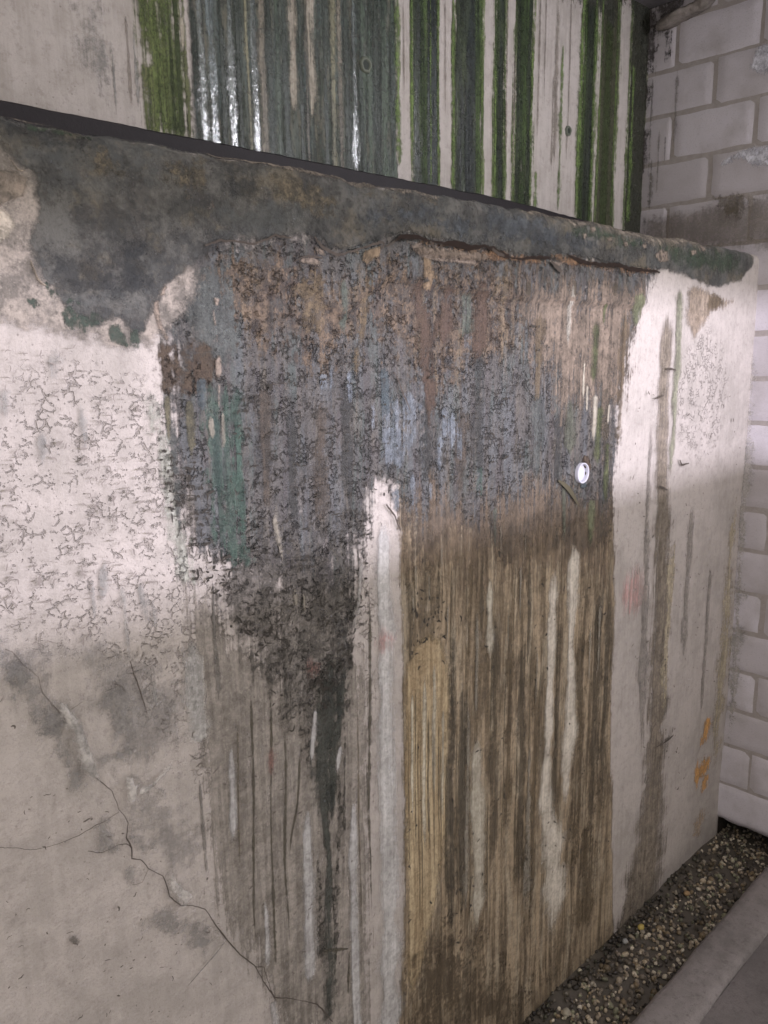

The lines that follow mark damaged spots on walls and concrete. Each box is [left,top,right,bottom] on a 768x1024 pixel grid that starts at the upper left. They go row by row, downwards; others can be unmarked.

water stain [141,0,446,185]
water stain [455,0,484,194]
water stain [493,0,508,199]
water stain [513,0,533,205]
water stain [577,0,603,222]
water stain [595,10,613,225]
water stain [603,0,627,226]
water stain [0,145,136,349]
crack [5,649,80,719]
crack [114,661,147,713]
water stain [617,318,675,929]
crack [0,776,333,1022]